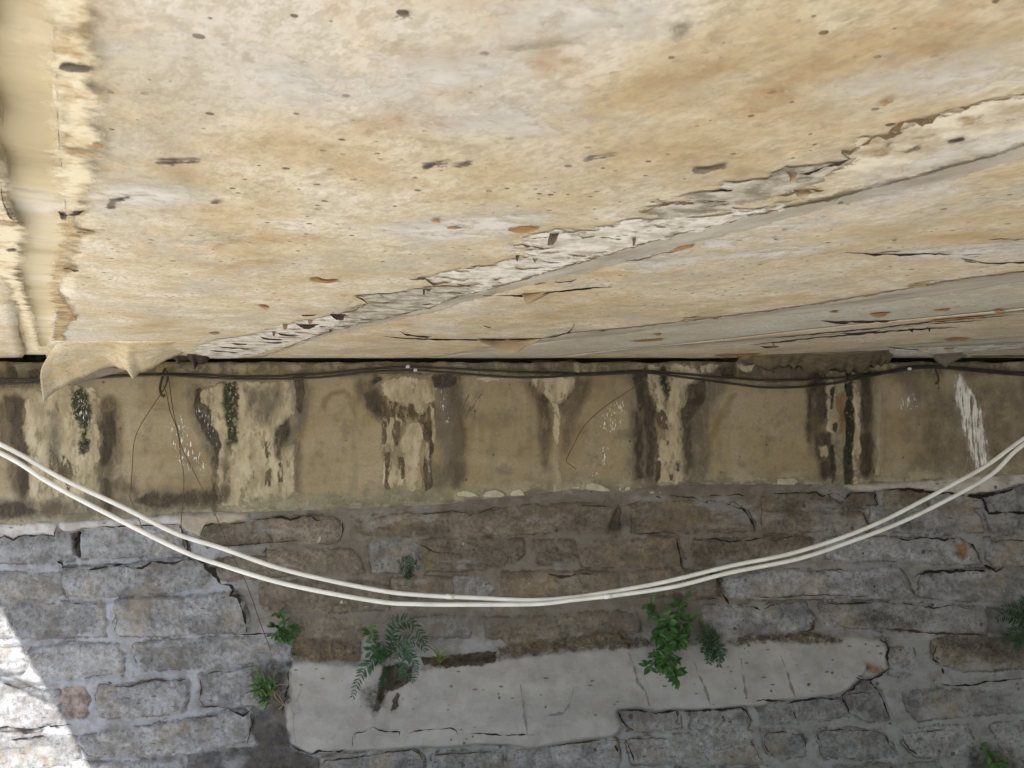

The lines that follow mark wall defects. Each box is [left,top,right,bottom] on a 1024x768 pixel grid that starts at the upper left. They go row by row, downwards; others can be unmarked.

peeling [0,0,1024,402]
crack [845,238,1024,264]
crack [750,314,1023,348]
water stain [0,366,464,519]
water stain [530,362,587,490]
water stain [633,362,884,485]